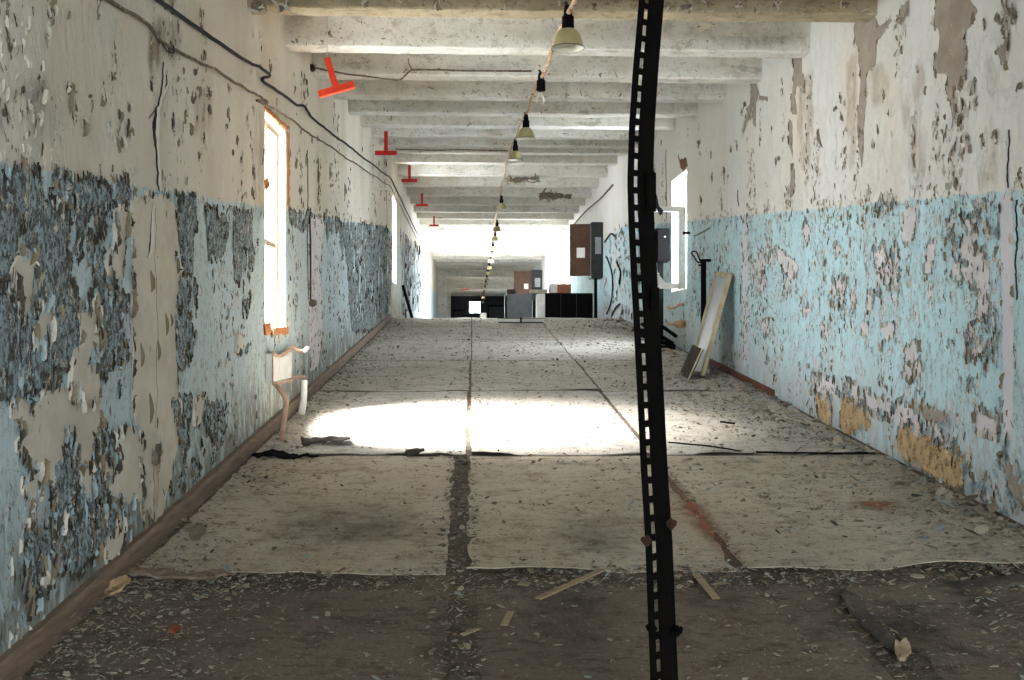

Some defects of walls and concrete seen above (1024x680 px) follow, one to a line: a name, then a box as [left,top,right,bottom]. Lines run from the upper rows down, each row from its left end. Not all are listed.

peeling [0,0,260,653]
crack [147,62,170,318]
peeling [247,0,291,14]
spalling [664,0,1024,526]